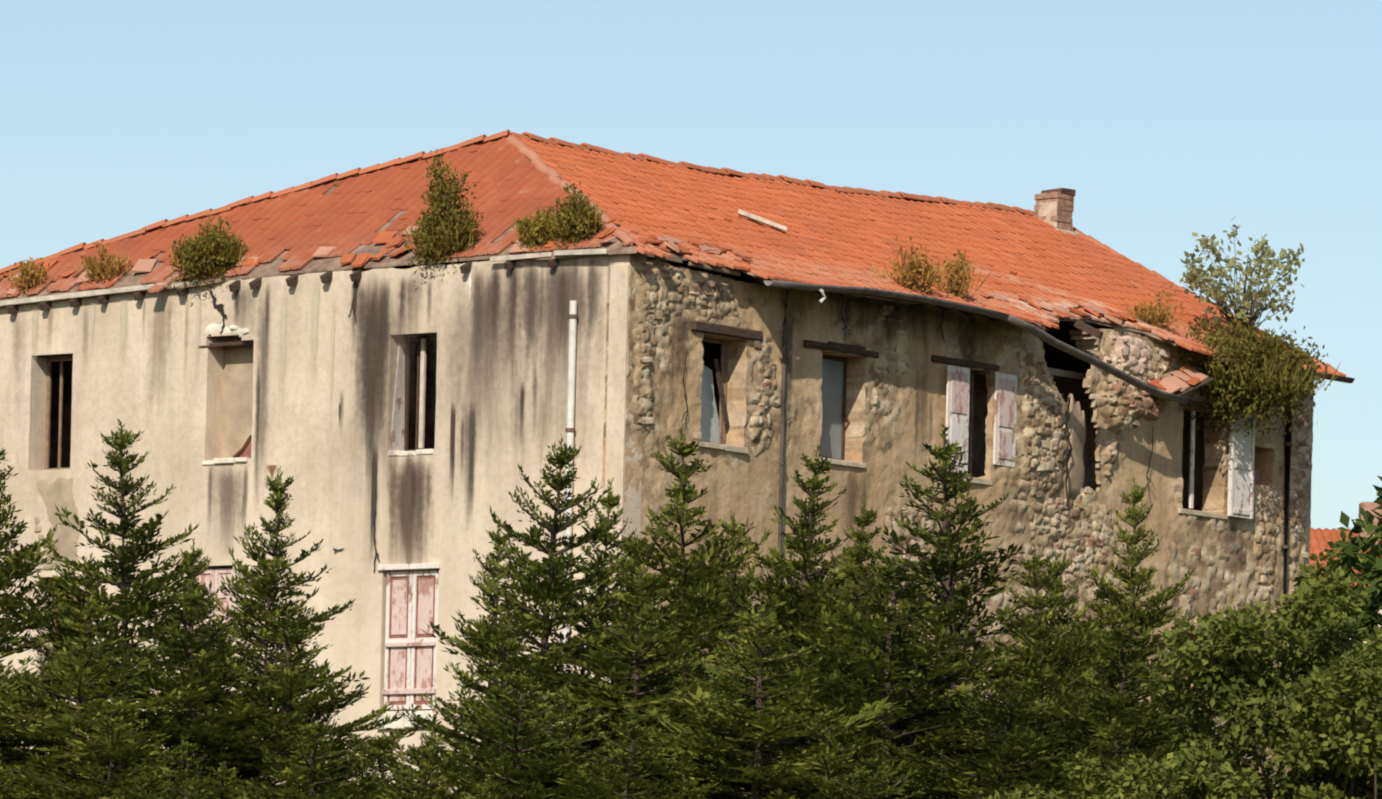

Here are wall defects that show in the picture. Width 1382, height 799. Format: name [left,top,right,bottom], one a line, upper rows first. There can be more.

damp [209,473,246,516]
damp [256,294,286,456]
damp [353,282,430,540]
damp [450,407,474,493]
flaking render [631,259,738,435]
flaking render [747,337,777,457]
flaking render [1015,335,1122,628]
peeling [1115,335,1148,376]
spalling [1127,392,1164,421]
flaking render [1253,406,1312,611]